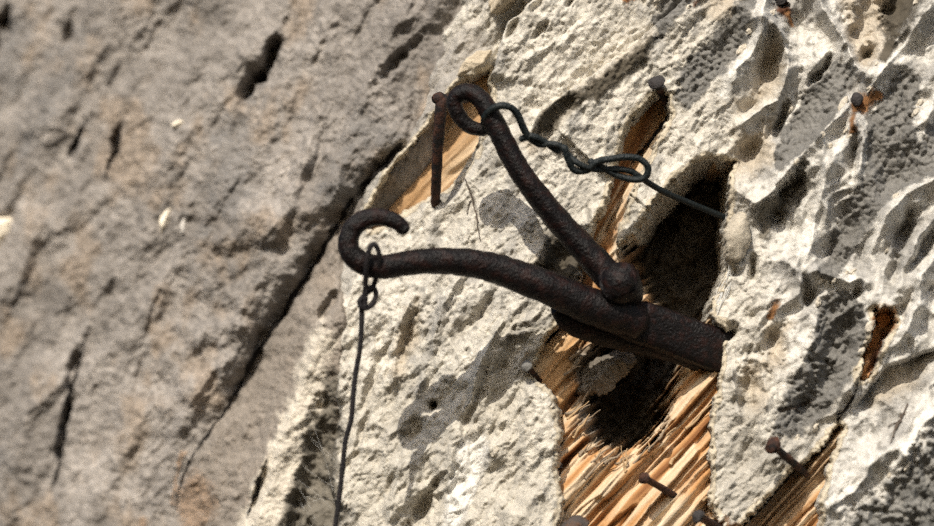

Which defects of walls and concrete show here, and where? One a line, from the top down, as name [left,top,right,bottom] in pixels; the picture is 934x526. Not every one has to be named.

rust [776,6,794,26]
flaking render [364,108,435,209]
flaking render [399,135,487,218]
flaking render [444,63,497,102]
flaking render [588,0,776,250]
rust [849,90,883,134]
flaking render [366,226,388,235]
rust [867,305,897,372]
flaking render [525,319,565,526]
crack [890,403,908,443]